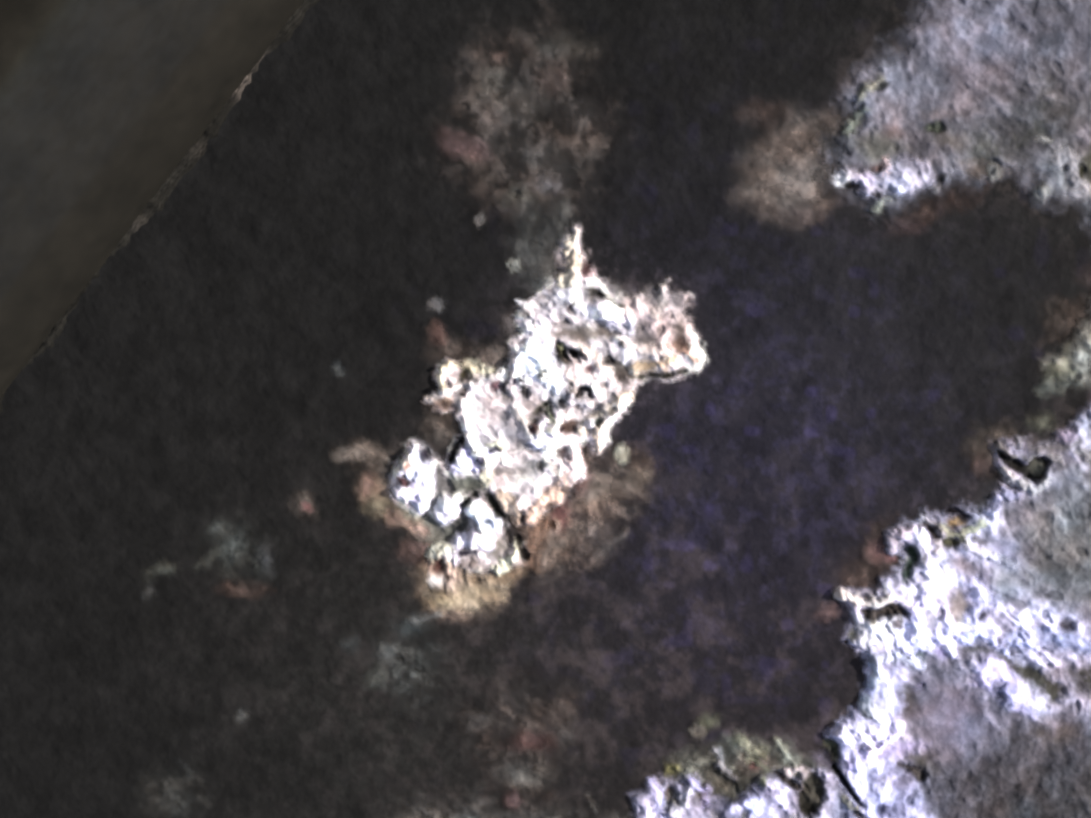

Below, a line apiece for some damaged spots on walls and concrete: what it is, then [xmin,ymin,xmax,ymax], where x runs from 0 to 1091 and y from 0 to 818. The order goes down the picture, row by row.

water stain [427,297,444,312]